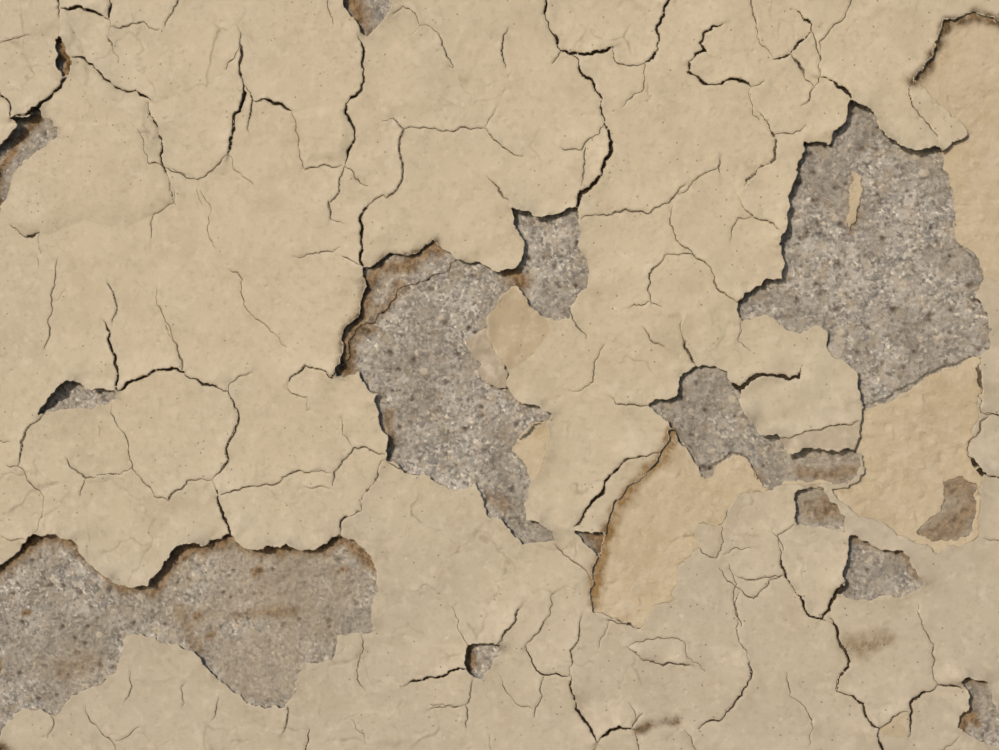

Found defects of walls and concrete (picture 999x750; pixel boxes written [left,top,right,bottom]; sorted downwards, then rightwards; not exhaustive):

spalling [0,107,58,209]
crack [0,0,523,266]
spalling [343,0,393,36]
crack [544,0,749,349]
crack [687,0,852,240]
crack [66,284,416,536]
spalling [0,148,589,736]
crack [731,365,803,391]
spalling [575,12,999,629]
crack [498,593,704,750]
crack [685,512,962,750]
spalling [878,677,999,746]